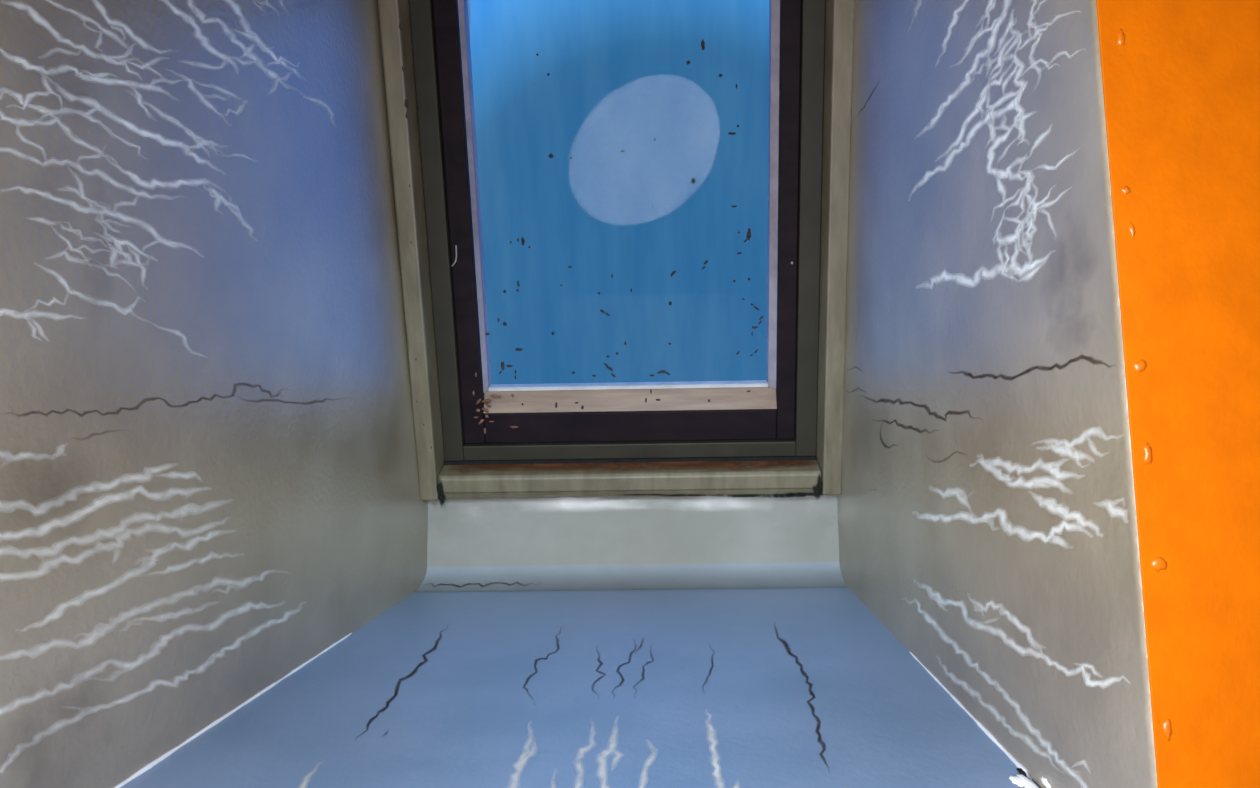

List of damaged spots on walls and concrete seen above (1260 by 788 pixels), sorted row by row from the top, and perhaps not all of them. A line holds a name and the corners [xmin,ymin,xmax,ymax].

damp [163,0,297,91]
damp [0,0,252,279]
damp [912,0,1058,288]
crack [965,355,1100,380]
crack [880,399,965,447]
damp [0,468,191,553]
damp [923,429,1096,543]
crack [367,638,440,729]
crack [523,641,559,688]
crack [777,635,825,761]
damp [918,603,1087,788]
damp [928,588,1116,686]